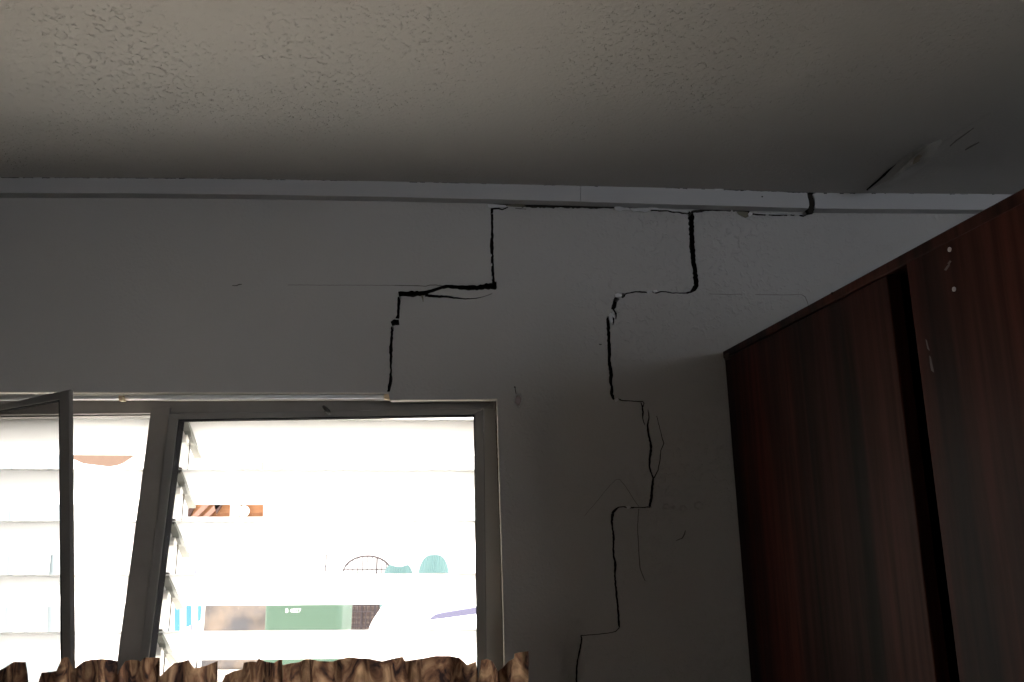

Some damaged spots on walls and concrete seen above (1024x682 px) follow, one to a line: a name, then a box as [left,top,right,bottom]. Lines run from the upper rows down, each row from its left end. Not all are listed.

crack [319,183,614,392]
crack [575,188,922,682]